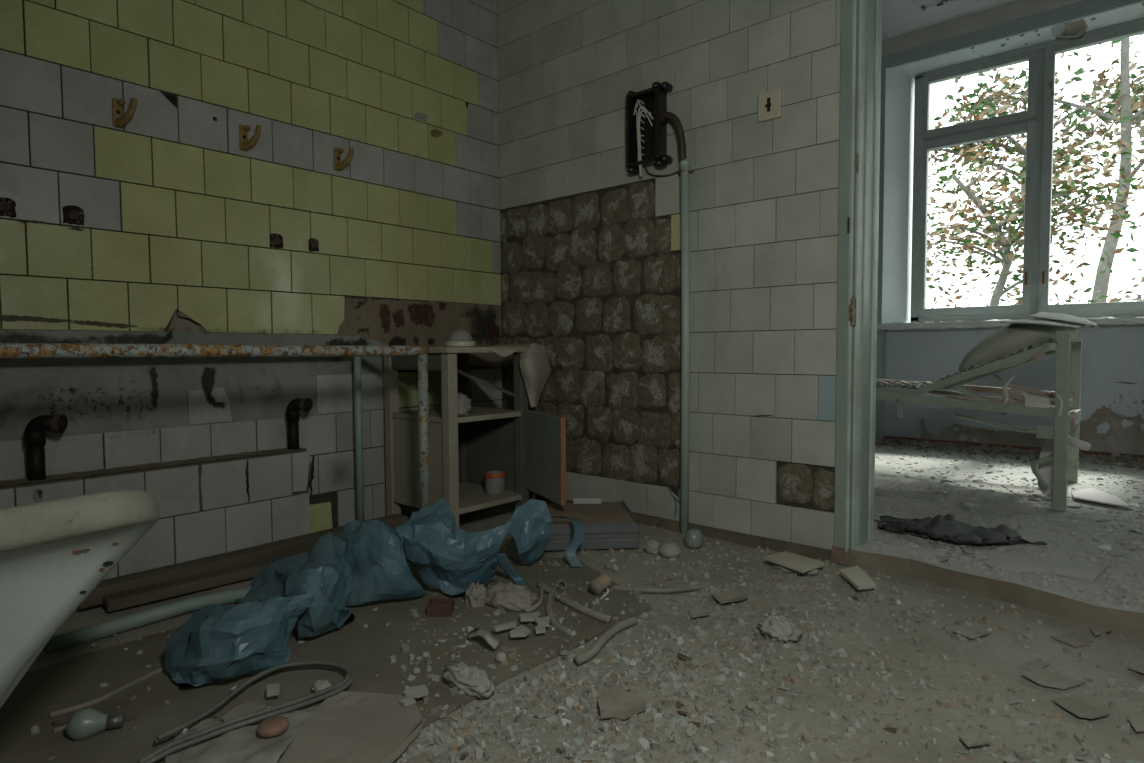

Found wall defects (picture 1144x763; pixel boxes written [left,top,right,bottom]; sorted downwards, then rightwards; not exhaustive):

peeling [0,179,681,489]
peeling [919,419,1045,447]
peeling [1079,382,1144,455]
peeling [777,461,835,512]